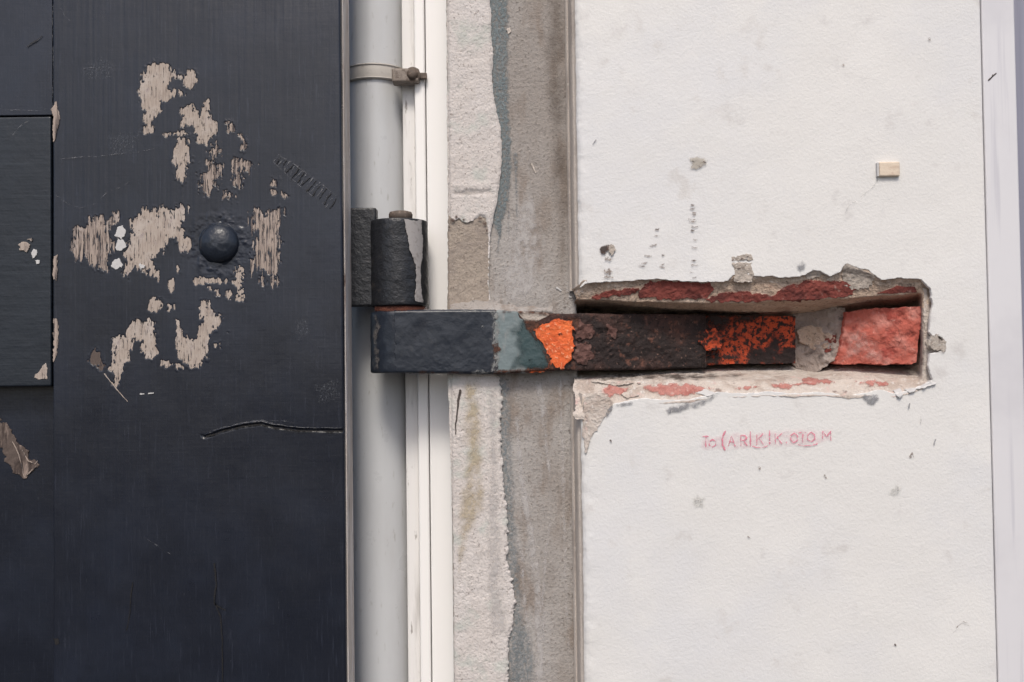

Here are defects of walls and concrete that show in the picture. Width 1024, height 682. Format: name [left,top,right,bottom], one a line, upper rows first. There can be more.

peeling [138,63,253,200]
leakage [490,0,536,299]
peeling [70,179,290,402]
spalling [447,215,490,312]
corrosion [495,311,618,373]
spalling [556,254,946,453]
peeling [0,418,40,479]